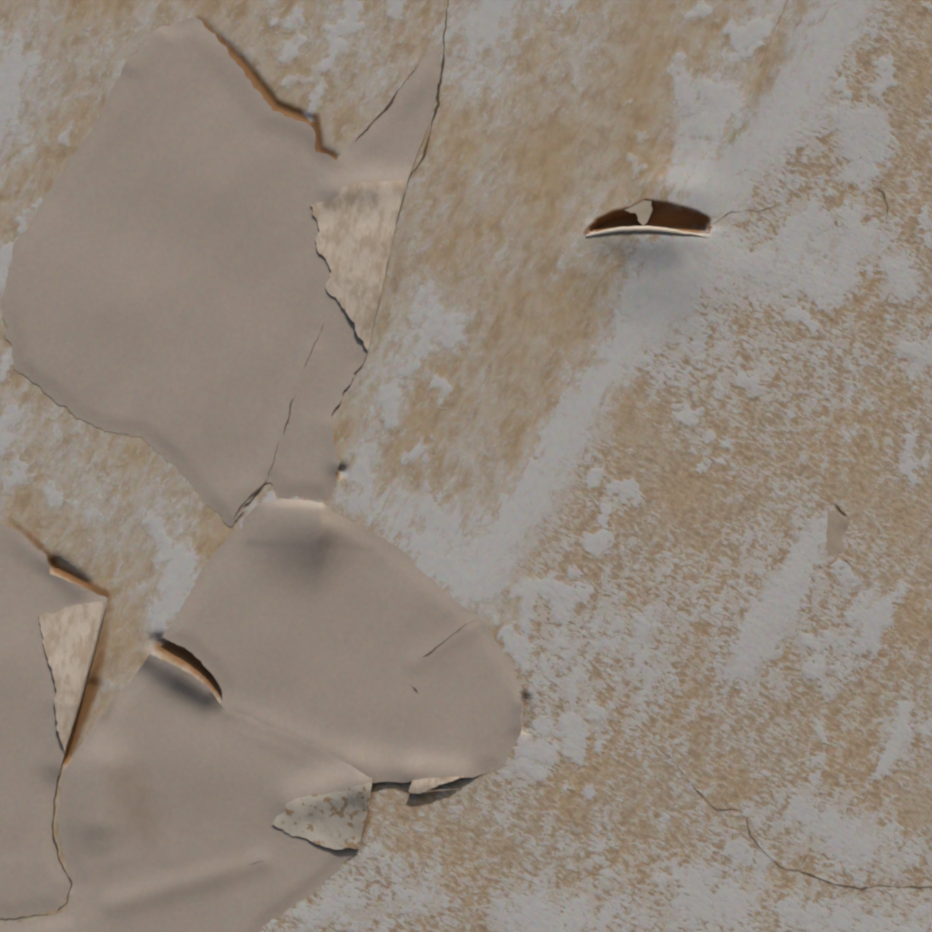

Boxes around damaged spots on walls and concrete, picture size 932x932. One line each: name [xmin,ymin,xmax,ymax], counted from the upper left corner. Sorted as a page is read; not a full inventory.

crack [357,67,417,139]
crack [411,0,449,175]
peeling [461,0,902,625]
peeling [0,0,607,932]
crack [656,746,932,900]